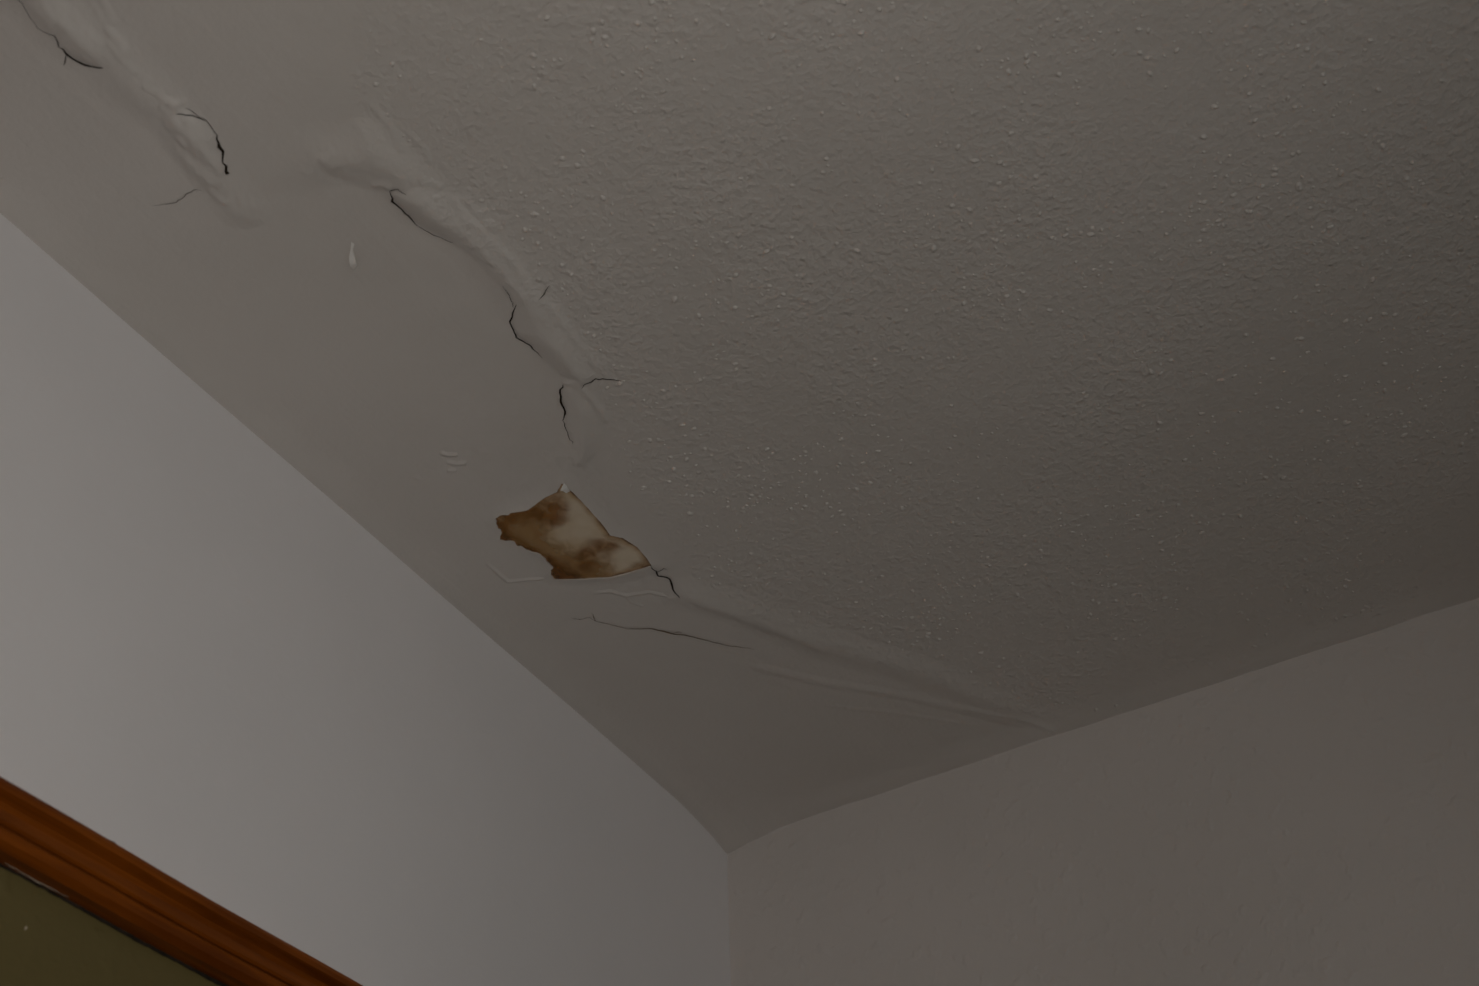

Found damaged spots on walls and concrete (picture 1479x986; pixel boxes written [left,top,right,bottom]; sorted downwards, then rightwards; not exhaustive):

crack [19,0,101,68]
crack [161,108,230,205]
crack [389,189,452,243]
crack [502,285,550,357]
crack [559,378,619,444]
water stain [497,501,617,579]
crack [650,564,679,597]
crack [573,615,742,648]